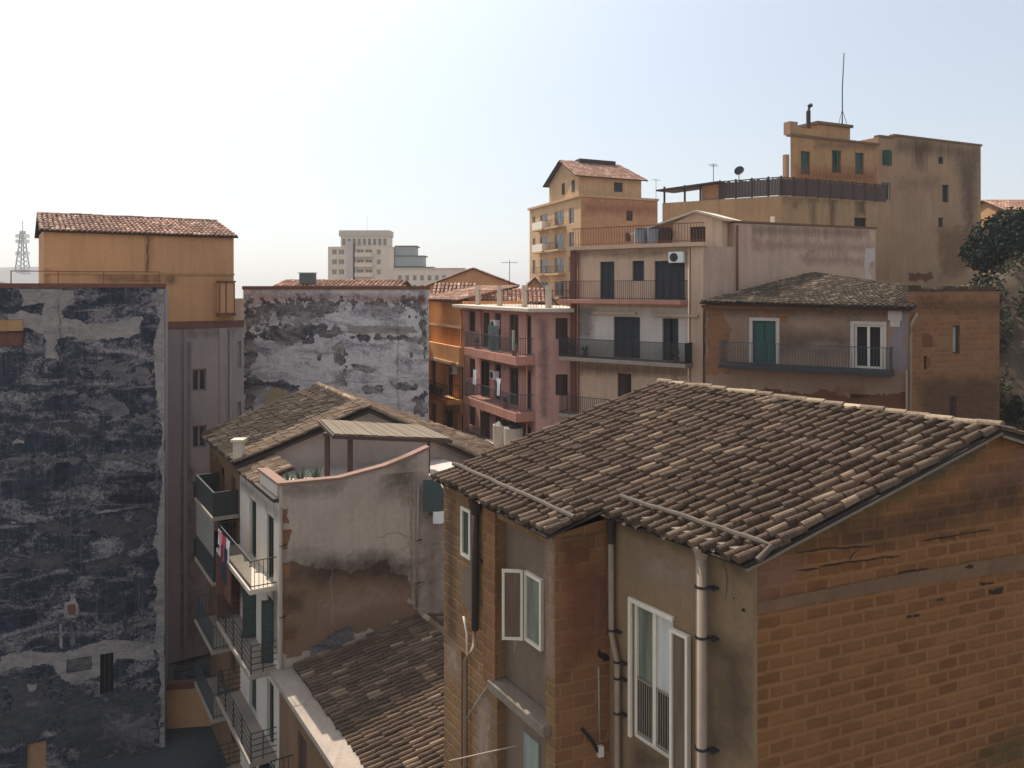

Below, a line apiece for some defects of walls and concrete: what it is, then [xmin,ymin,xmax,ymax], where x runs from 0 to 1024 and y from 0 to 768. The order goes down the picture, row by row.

peeling [336,295,428,319]
peeling [344,334,371,342]
peeling [335,366,348,387]
peeling [0,289,165,753]
crack [923,529,990,541]
crack [791,545,927,575]